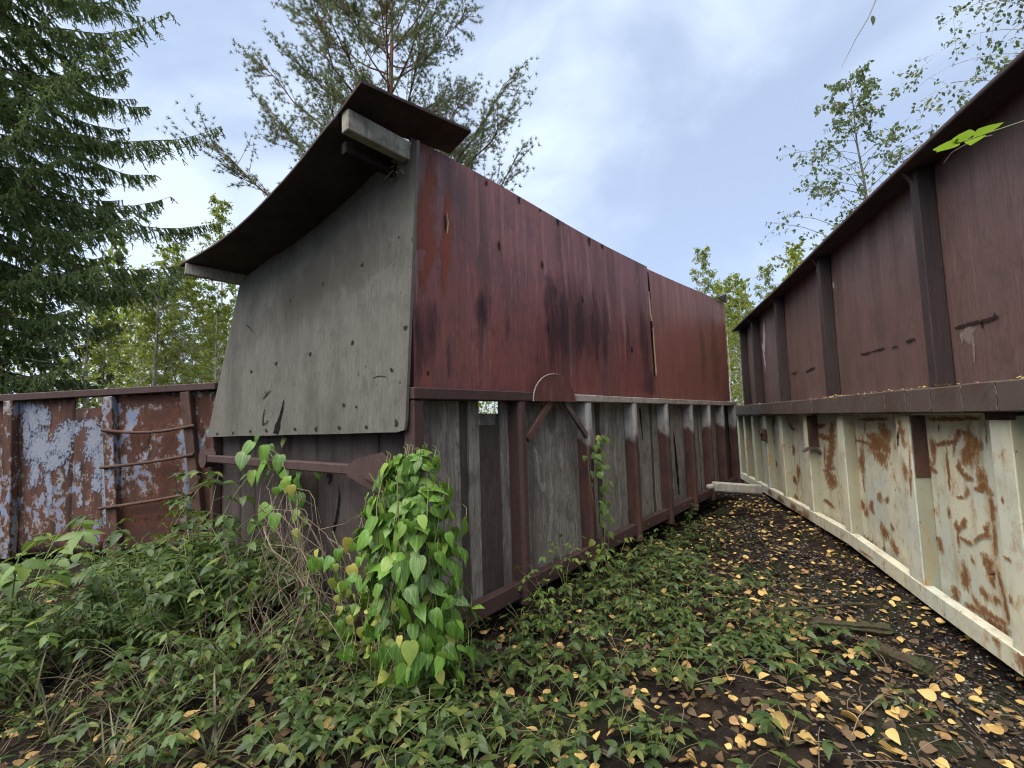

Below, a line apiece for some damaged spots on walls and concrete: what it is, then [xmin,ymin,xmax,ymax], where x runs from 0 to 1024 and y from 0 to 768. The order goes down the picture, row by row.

corrosion [417,158,451,289]
peeling [20,401,106,542]
corrosion [767,444,809,520]
corrosion [817,422,838,509]
corrosion [855,417,912,559]
corrosion [929,416,1012,646]